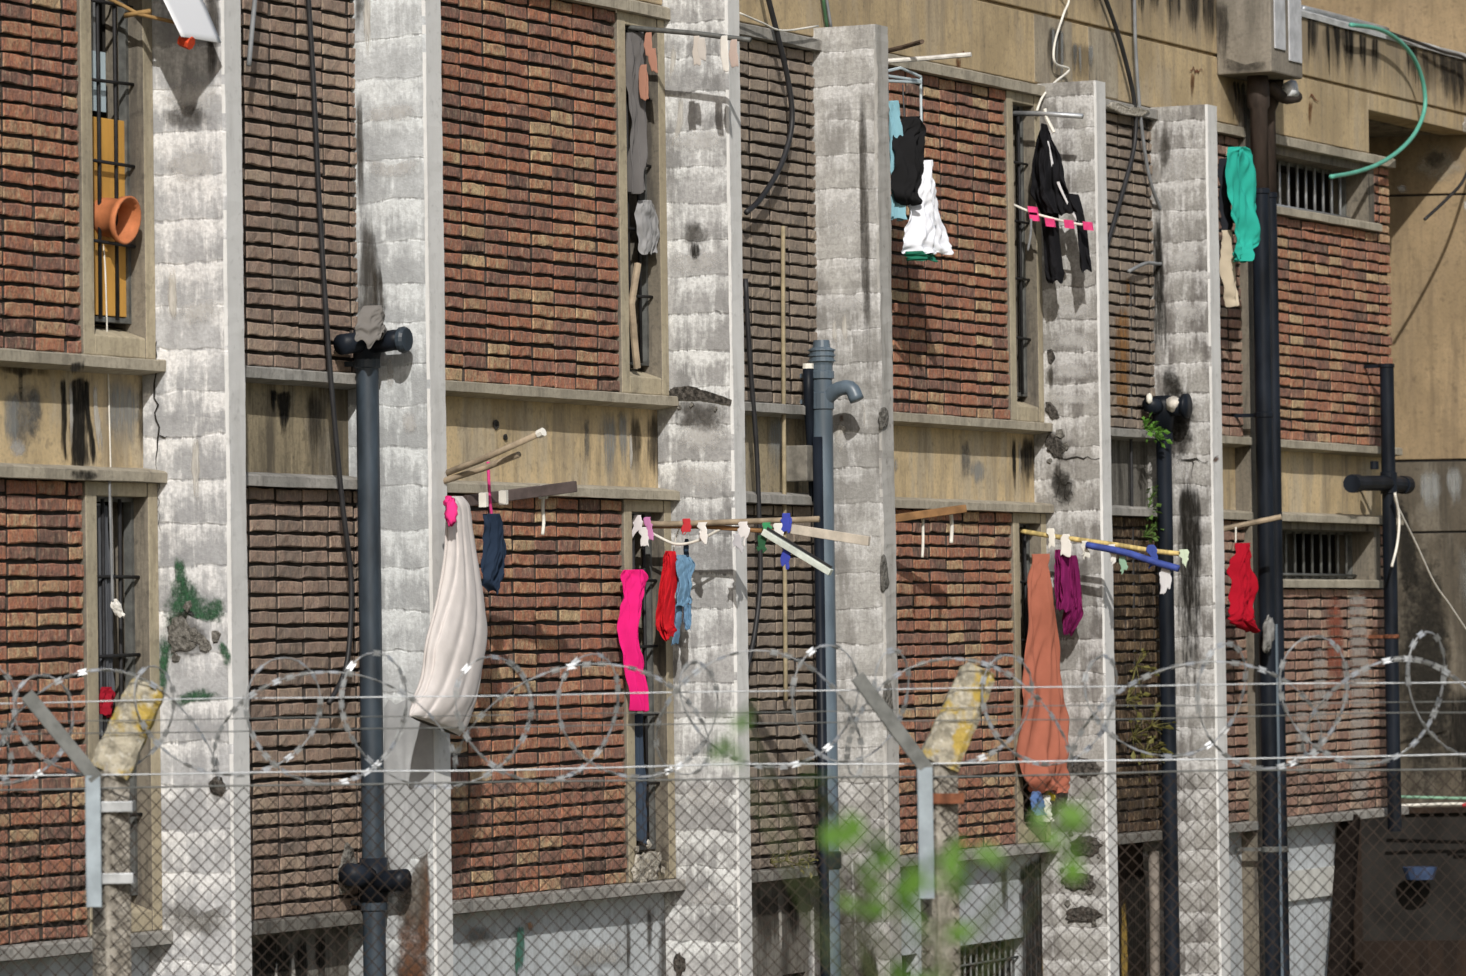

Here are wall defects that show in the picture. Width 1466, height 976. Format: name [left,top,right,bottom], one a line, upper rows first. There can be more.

leakage [1141,0,1260,124]
leakage [1308,19,1379,73]
leakage [1407,46,1465,97]
leakage [1153,220,1199,340]
leakage [1163,371,1182,397]
leakage [61,362,143,480]
crack [153,341,171,528]
leakage [1012,439,1035,486]
leakage [1052,473,1073,501]
leakage [1172,415,1201,680]
leakage [174,558,187,594]
leakage [219,643,231,664]